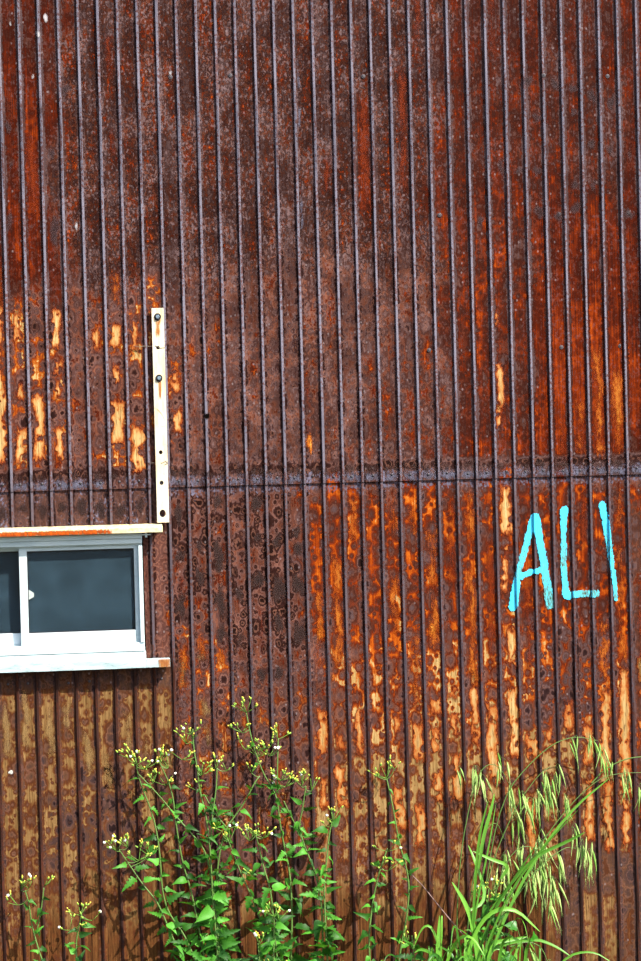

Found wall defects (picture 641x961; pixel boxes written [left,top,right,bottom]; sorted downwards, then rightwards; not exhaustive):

peeling [0,302,65,465]
peeling [110,398,148,473]
corrosion [578,352,626,455]
peeling [498,484,513,594]
corrosion [159,649,187,688]
corrosion [331,557,346,664]
corrosion [389,578,399,628]
corrosion [410,511,482,694]
corrosion [598,621,641,677]
peeling [300,707,364,812]
peeling [393,670,556,784]
peeling [563,657,641,854]